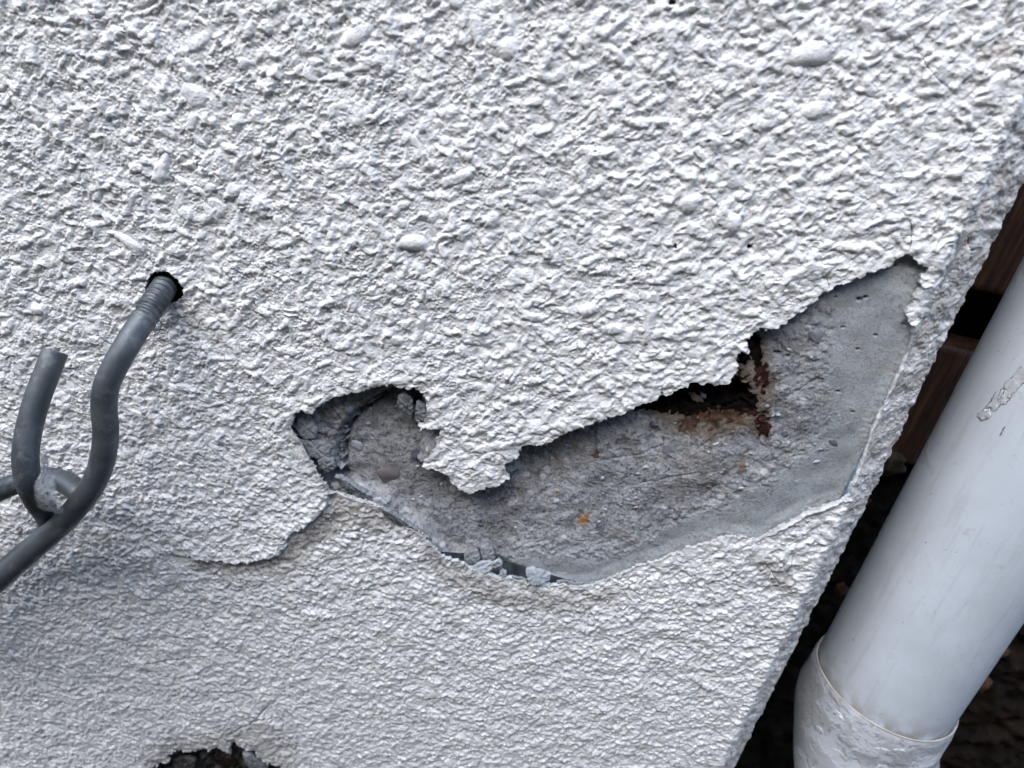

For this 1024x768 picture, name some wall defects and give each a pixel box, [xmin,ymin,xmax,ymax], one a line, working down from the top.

spalling [288,228,968,587]
corrosion [634,332,772,437]
spalling [153,741,281,768]